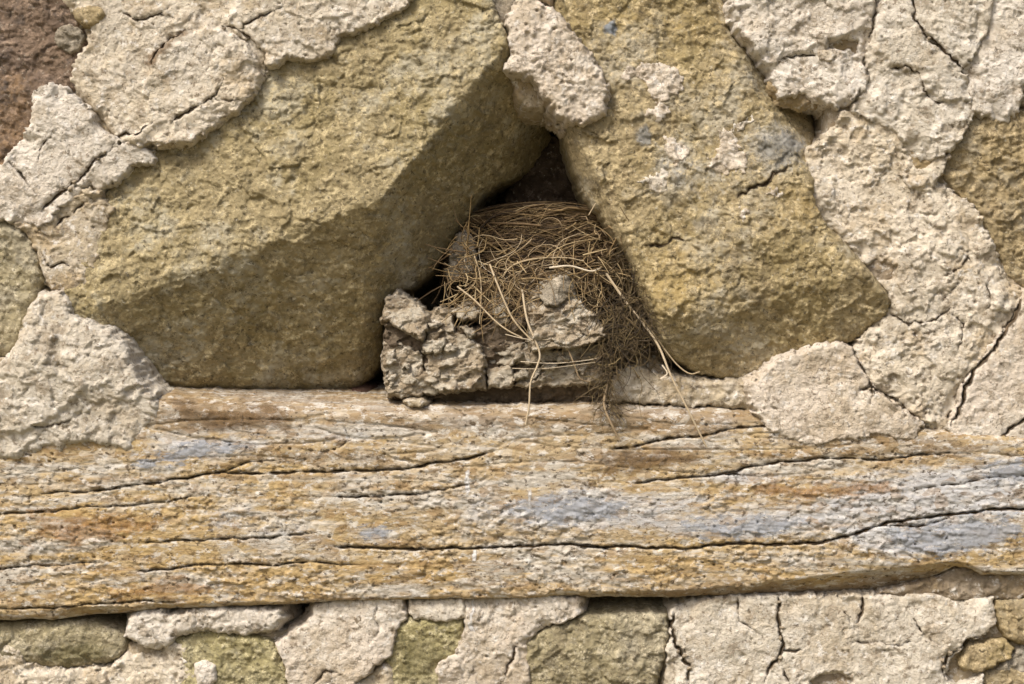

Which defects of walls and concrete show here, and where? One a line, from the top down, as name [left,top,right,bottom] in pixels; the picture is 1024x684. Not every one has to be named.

crack [125,12,185,63]
crack [221,5,283,39]
crack [891,0,970,104]
crack [11,87,248,225]
crack [891,251,1021,422]
crack [853,349,918,417]
crack [5,428,484,514]
crack [637,452,950,484]
crack [140,508,1024,572]
crack [669,614,692,681]
crack [737,597,806,681]